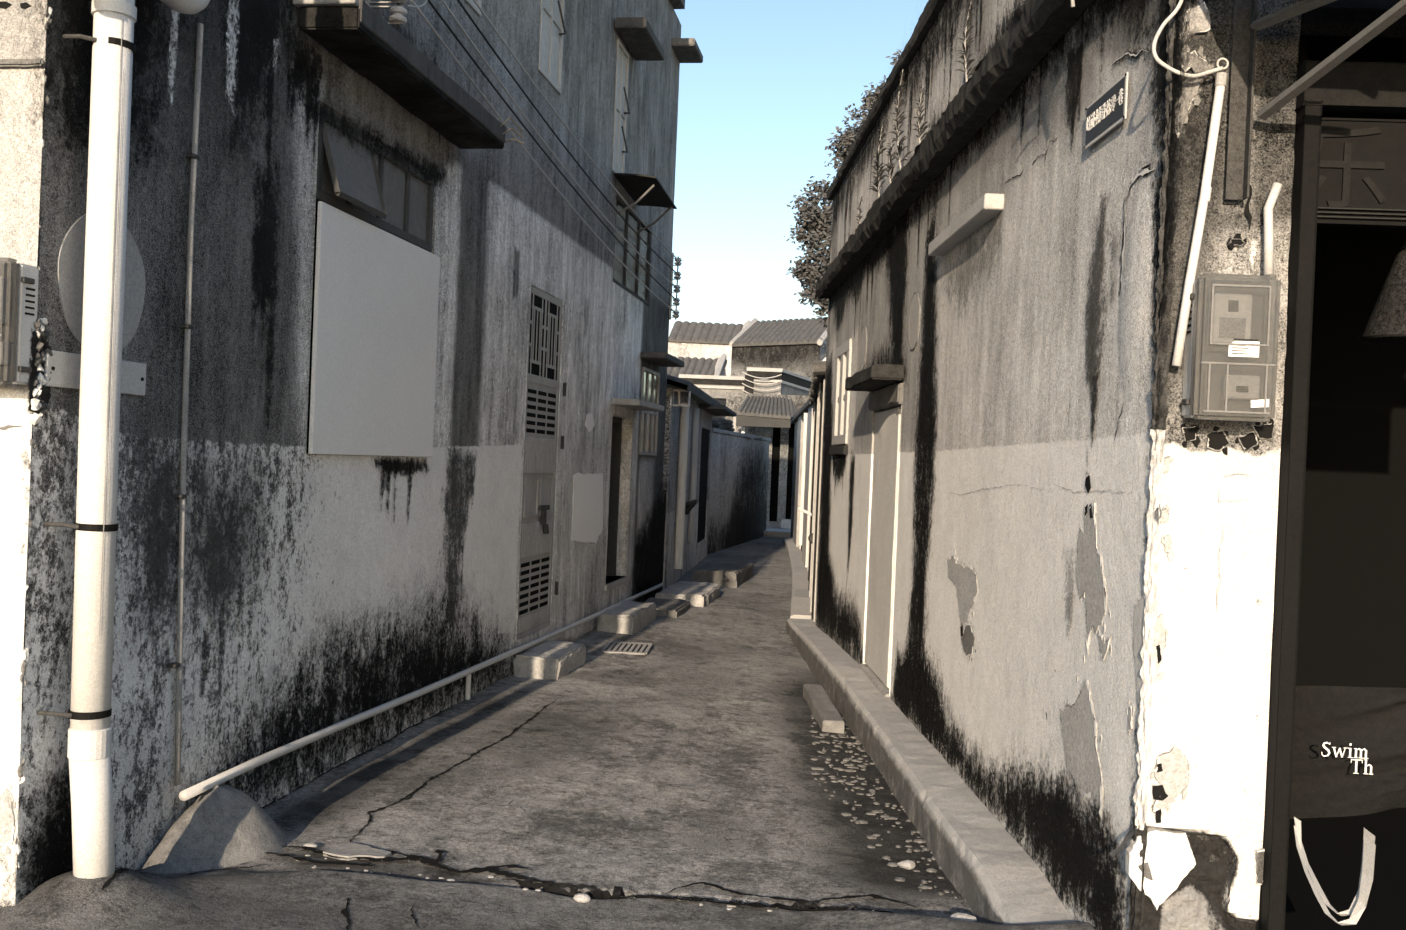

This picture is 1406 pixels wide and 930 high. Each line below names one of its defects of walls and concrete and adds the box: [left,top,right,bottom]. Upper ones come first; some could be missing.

leakage [32,0,93,156]
leakage [129,0,446,431]
leakage [27,318,53,427]
leakage [214,446,517,807]
leakage [816,356,863,664]
peeling [947,548,978,661]
leakage [829,0,1193,930]
peeling [1057,475,1112,830]
peeling [1127,585,1169,735]
crack [101,701,917,930]
spalling [1109,743,1256,930]
peeling [1255,848,1265,885]